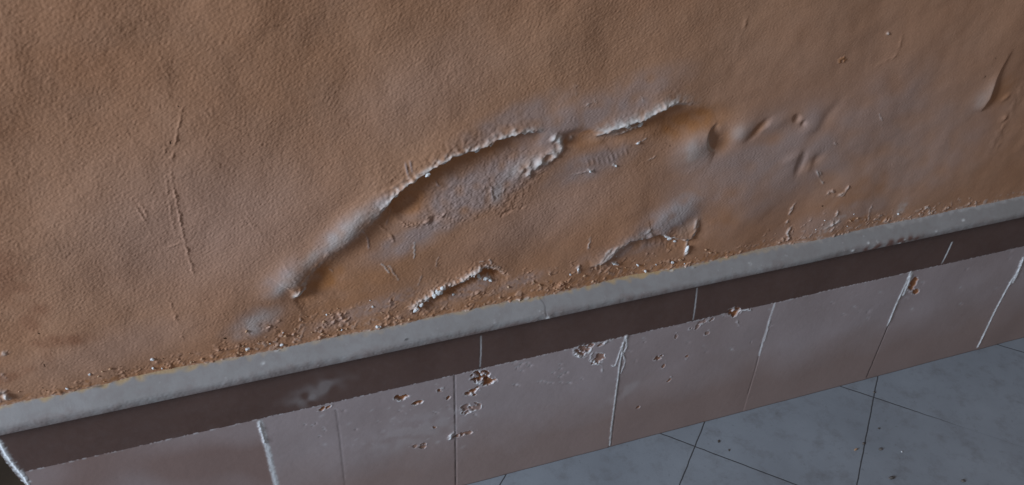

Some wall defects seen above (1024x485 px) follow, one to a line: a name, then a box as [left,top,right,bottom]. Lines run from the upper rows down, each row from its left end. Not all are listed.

crack [154,48,197,277]
spalling [364,93,729,250]
spalling [0,191,1024,407]
crack [976,257,1024,348]
spalling [390,369,499,416]
crack [608,335,629,446]